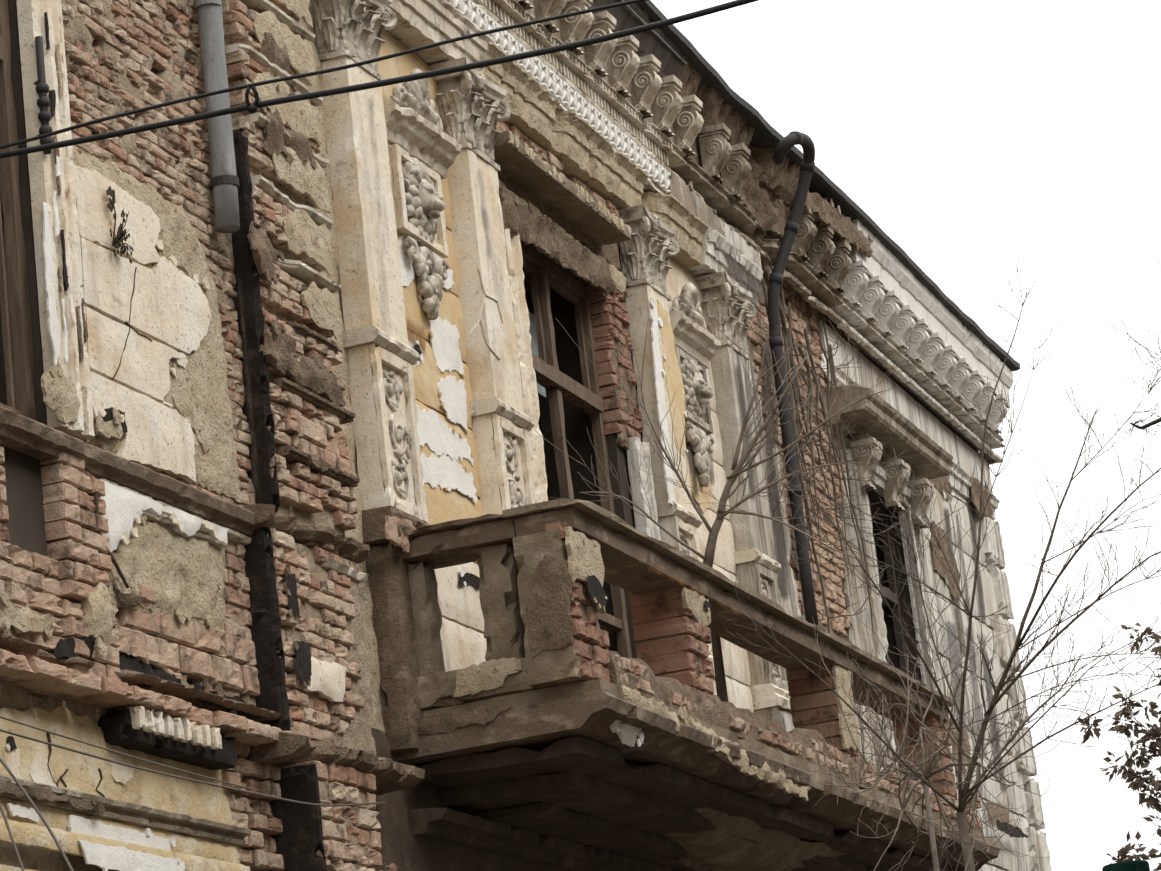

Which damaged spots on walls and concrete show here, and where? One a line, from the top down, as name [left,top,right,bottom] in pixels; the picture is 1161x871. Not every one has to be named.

peeling [44,12,64,116]
spalling [258,32,297,96]
spalling [257,106,317,169]
peeling [41,135,128,441]
crack [111,267,153,380]
spalling [247,219,284,284]
spalling [170,349,223,453]
peeling [408,317,477,504]
spalling [0,479,262,720]
spalling [453,658,523,697]
spalling [610,720,644,747]
spalling [617,682,811,801]